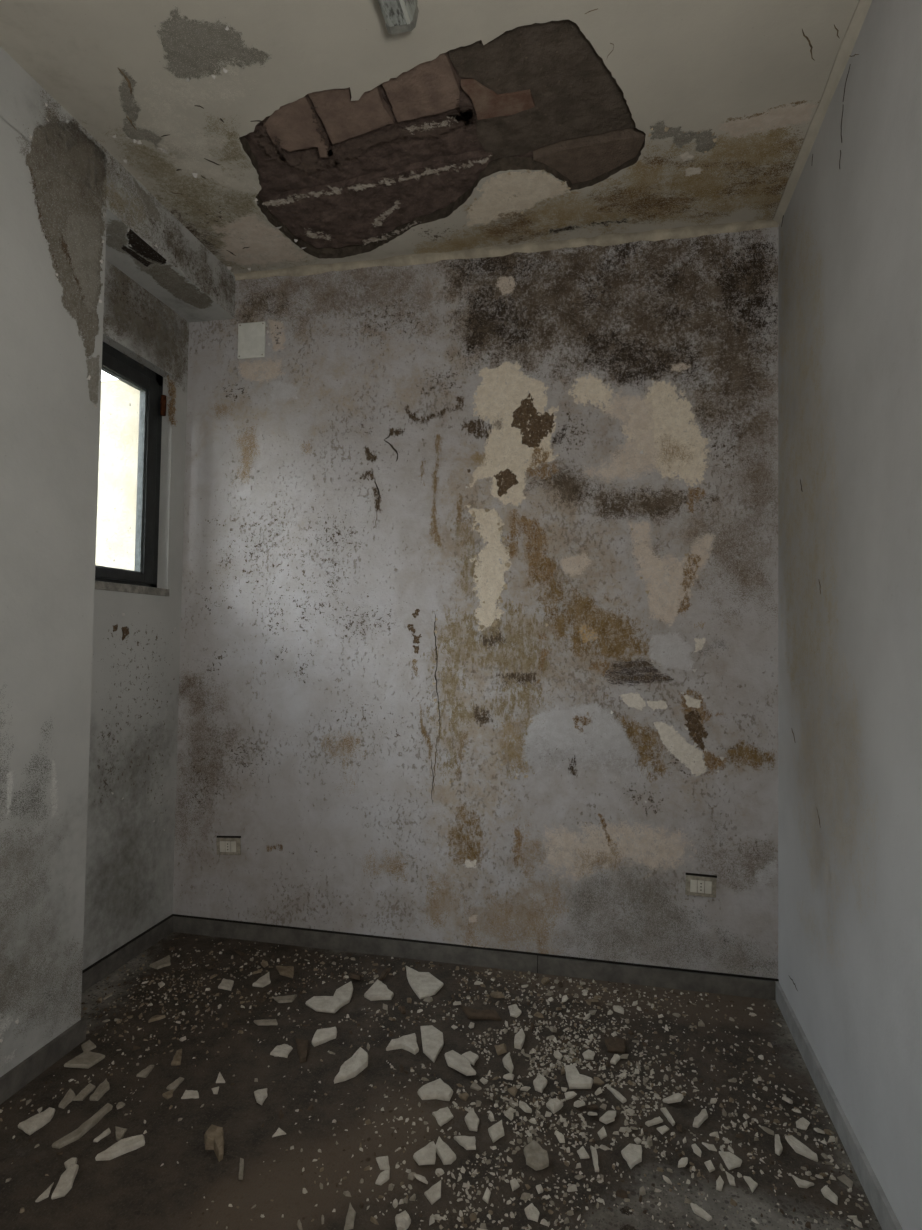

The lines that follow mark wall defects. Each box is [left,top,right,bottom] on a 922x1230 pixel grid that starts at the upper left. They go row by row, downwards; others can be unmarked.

spalling [17,103,214,408]
peeling [144,5,272,112]
damp [39,68,808,632]
peeling [446,361,561,631]
spalling [239,19,821,259]
peeling [565,363,711,514]
damp [93,613,268,860]
damp [192,491,660,798]
damp [603,692,671,783]
spalling [583,621,729,780]
damp [0,686,83,1048]
damp [422,802,778,979]